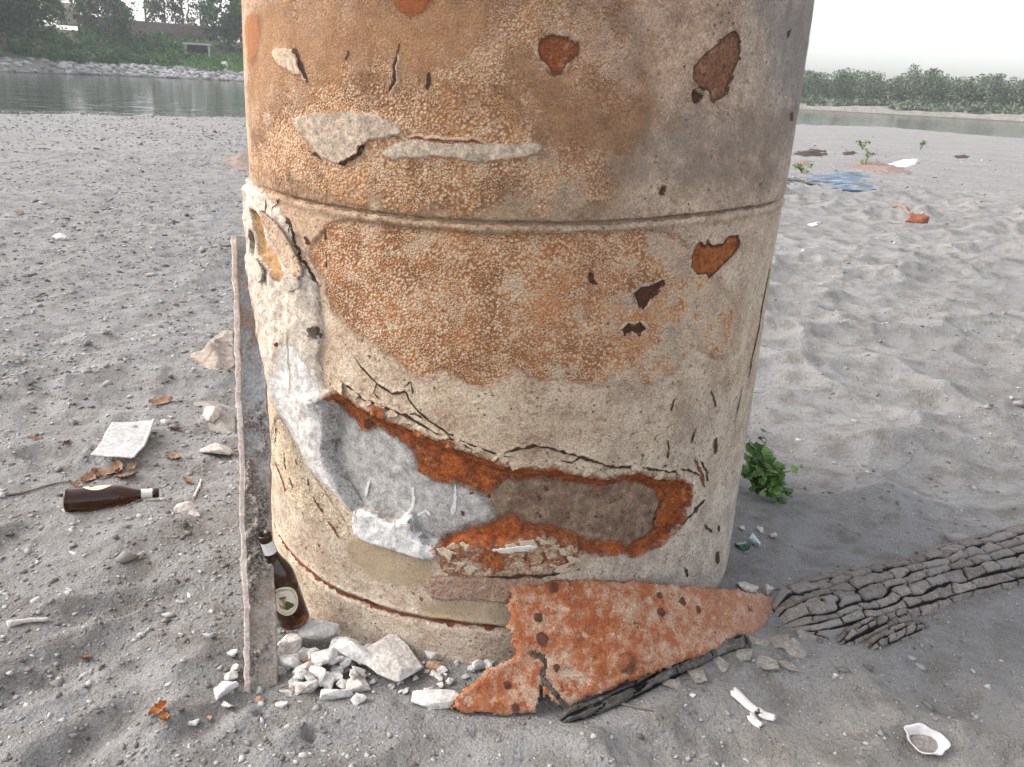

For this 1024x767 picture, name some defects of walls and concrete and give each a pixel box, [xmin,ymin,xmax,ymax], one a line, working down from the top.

crack [389,43,401,94]
peeling [293,110,543,166]
crack [424,72,432,90]
rust [244,0,741,388]
peeling [314,379,582,603]
rust [323,394,693,558]
crack [339,352,713,533]
peeling [583,461,700,486]